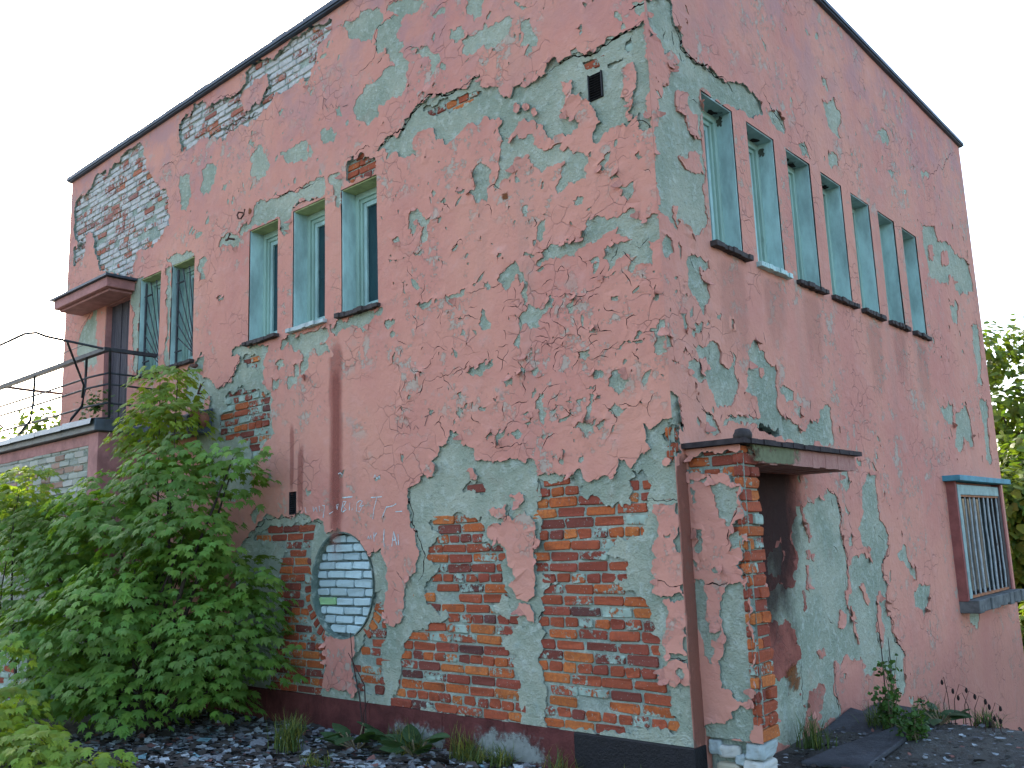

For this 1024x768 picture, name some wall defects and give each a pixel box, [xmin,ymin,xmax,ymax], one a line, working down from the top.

flaking render [73,142,170,375]
peeling [163,250,207,366]
crack [398,219,659,449]
flaking render [178,0,931,748]
peeling [917,219,992,464]